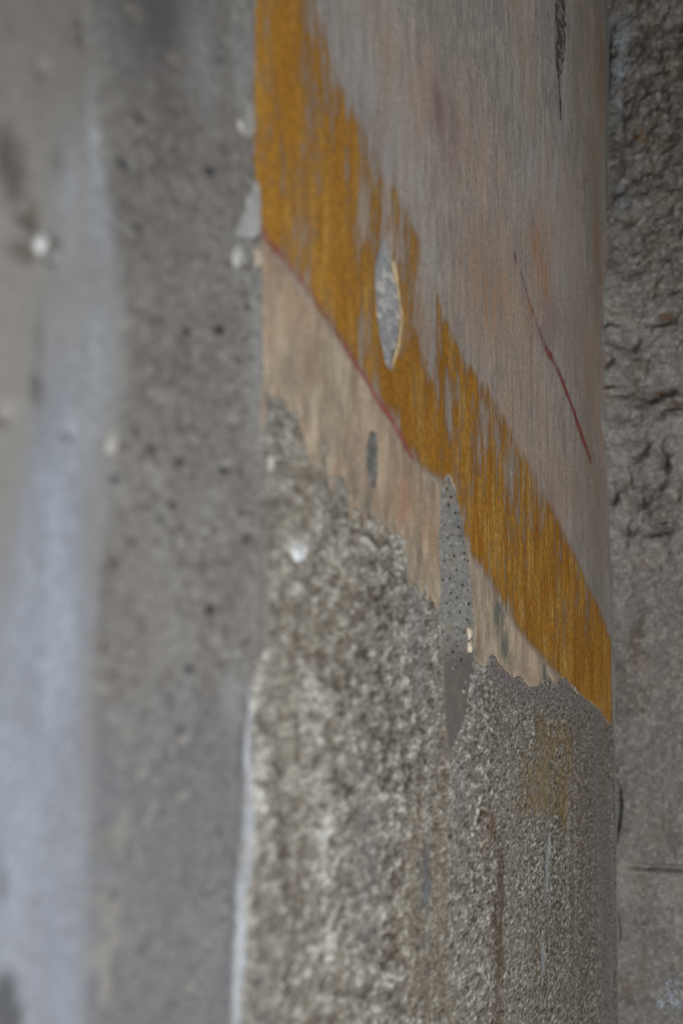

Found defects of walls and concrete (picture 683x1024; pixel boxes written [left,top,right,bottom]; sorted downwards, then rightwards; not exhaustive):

flaking render [555,0,567,76]
flaking render [375,238,403,370]